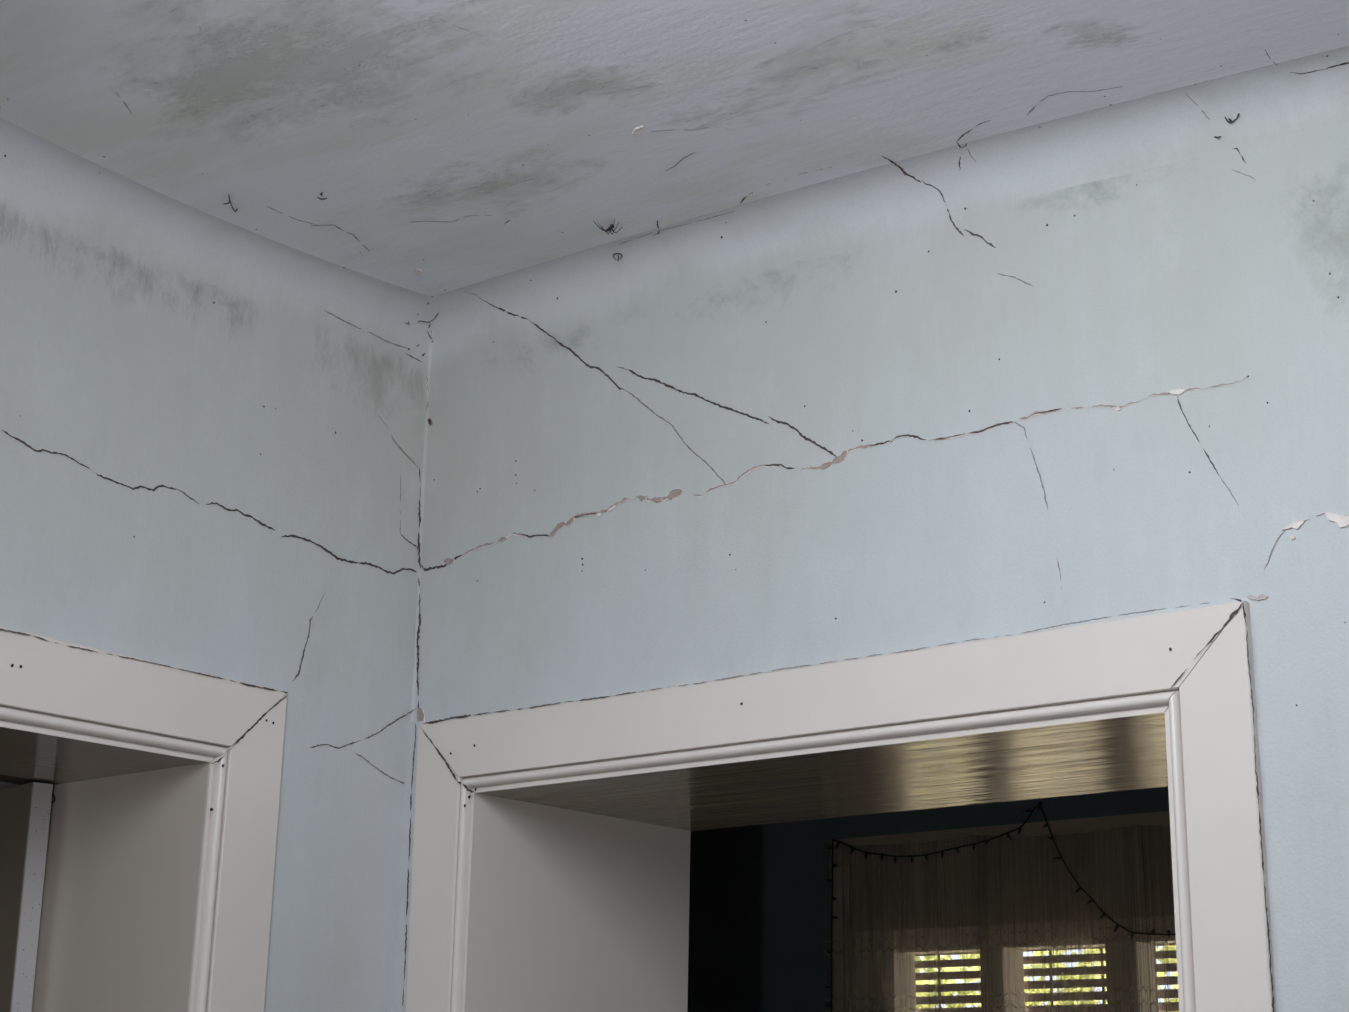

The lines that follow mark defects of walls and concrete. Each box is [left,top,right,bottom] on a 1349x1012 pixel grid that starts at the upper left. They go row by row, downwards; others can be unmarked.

crack [882,120,1032,286]
crack [1264,512,1349,569]
crack [0,292,1274,1012]